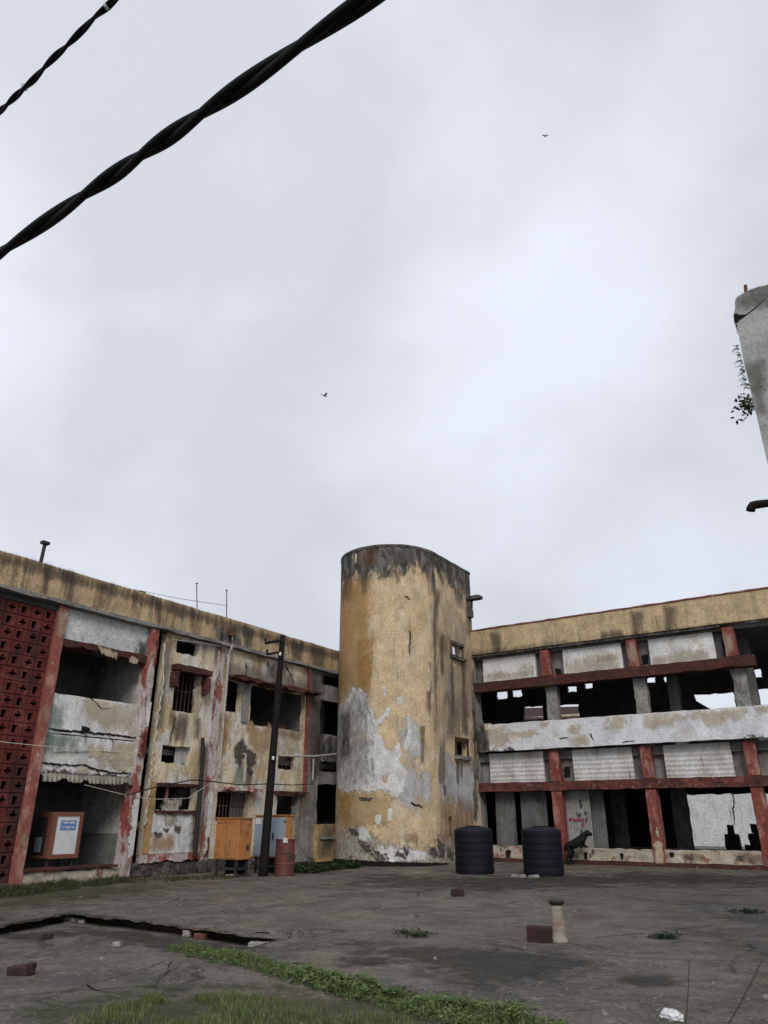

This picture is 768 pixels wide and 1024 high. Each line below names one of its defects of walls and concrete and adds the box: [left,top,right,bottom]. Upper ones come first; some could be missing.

peeling [43,699,152,778]
peeling [334,668,549,867]
peeling [644,706,768,729]
peeling [127,793,140,858]
peeling [147,791,214,861]